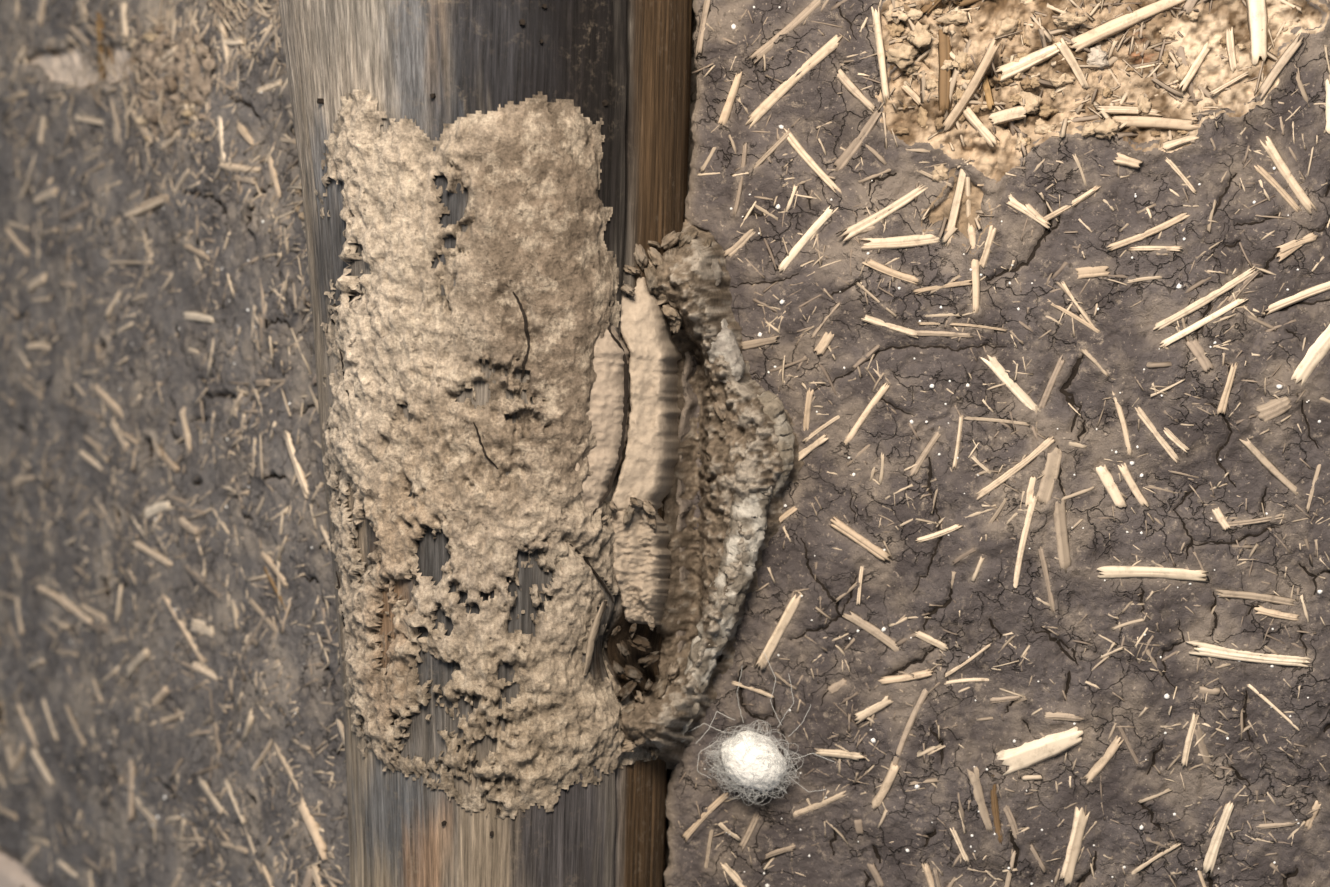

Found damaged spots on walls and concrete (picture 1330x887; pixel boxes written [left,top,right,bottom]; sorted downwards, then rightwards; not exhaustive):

spalling [11,37,133,91]
spalling [875,0,1330,255]
crack [987,191,1060,281]
crack [1214,173,1279,281]
crack [1196,303,1211,339]
crack [1257,299,1330,341]
crack [1057,354,1086,496]
crack [1173,403,1274,559]
crack [790,538,857,640]
crack [882,457,953,679]
crack [989,618,1078,701]
crack [1161,591,1259,691]